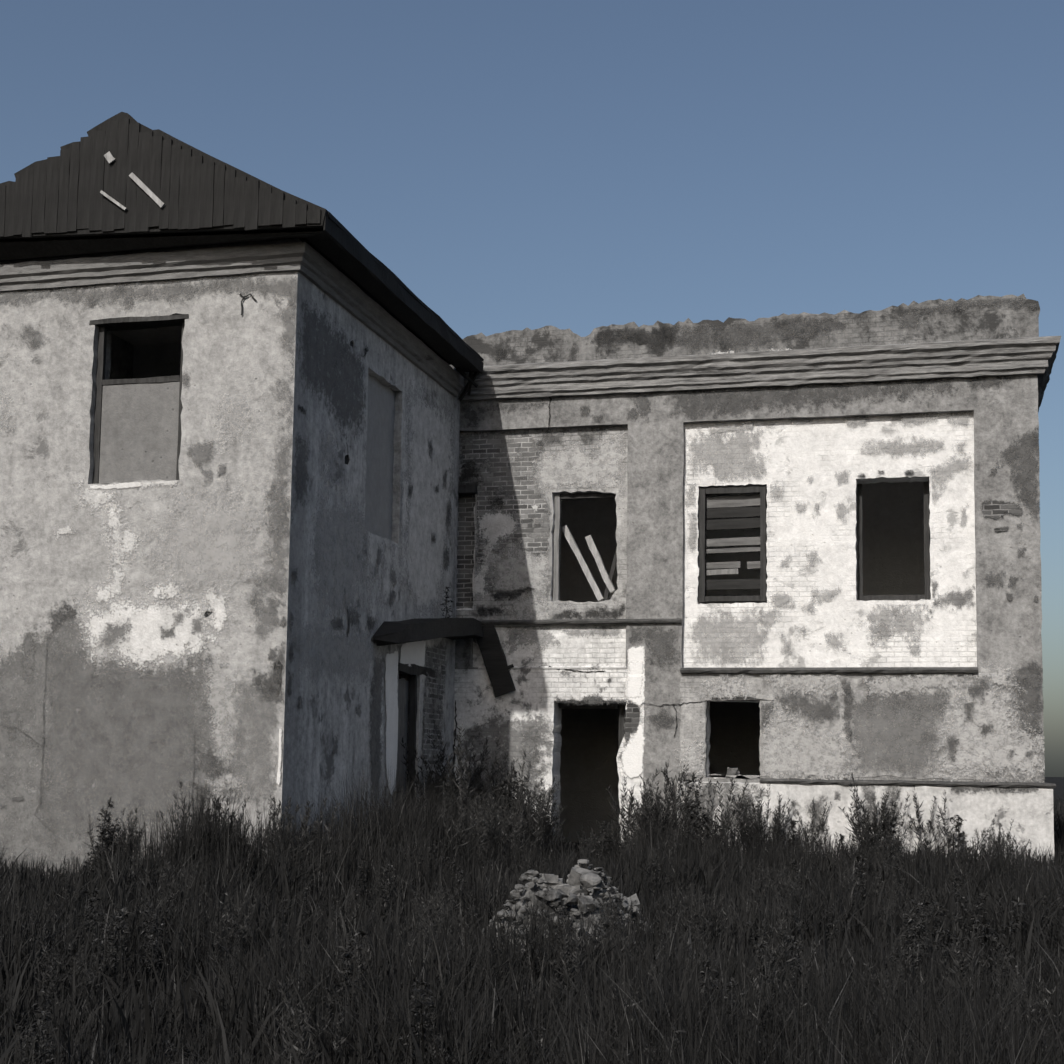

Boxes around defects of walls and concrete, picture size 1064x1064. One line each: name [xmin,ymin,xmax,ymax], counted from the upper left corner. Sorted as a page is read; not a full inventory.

water stain [675,317,842,354]
water stain [900,298,1037,329]
water stain [0,276,366,641]
peeling [401,386,550,616]
peeling [685,430,766,549]
flaking render [982,499,1022,532]
flaking render [51,579,230,671]
peeling [930,582,975,613]
crack [4,643,54,833]
water stain [0,600,230,876]
flaking render [456,707,556,803]
water stain [761,678,855,741]